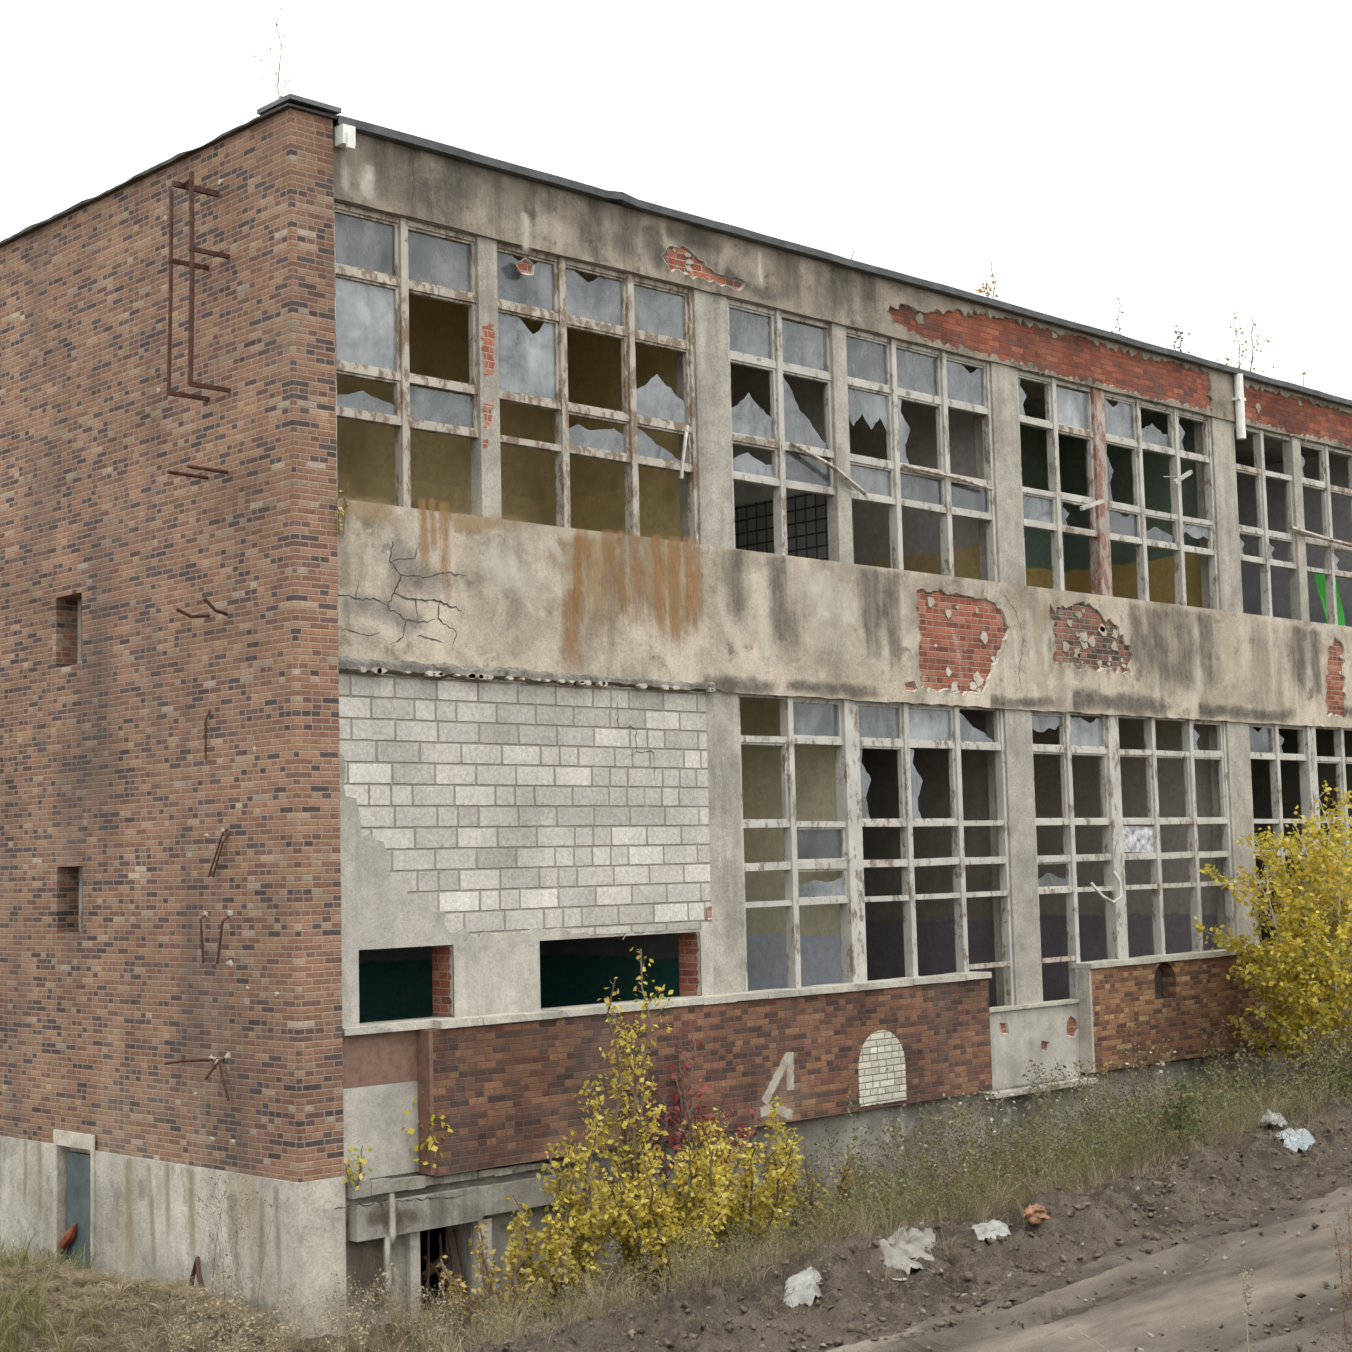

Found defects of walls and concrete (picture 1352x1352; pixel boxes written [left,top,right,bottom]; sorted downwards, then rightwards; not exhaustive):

flaking render [661,245,747,291]
flaking render [886,303,1213,412]
flaking render [1243,380,1352,448]
crack [338,541,466,644]
spalling [338,656,716,693]
rust [565,530,586,658]
rust [605,532,701,630]
flaking render [904,587,1010,697]
flaking render [1049,600,1133,675]
flaking render [1325,636,1349,719]